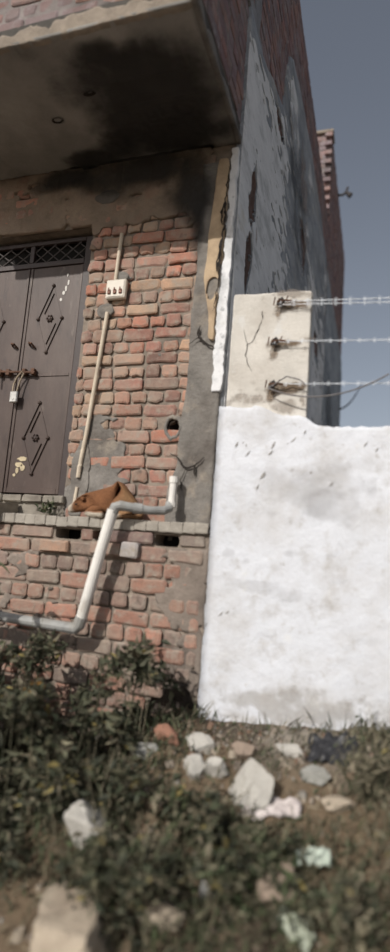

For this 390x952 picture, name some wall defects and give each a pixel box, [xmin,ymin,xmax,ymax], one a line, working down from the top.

water stain [36,118,229,192]
peeling [204,32,327,444]